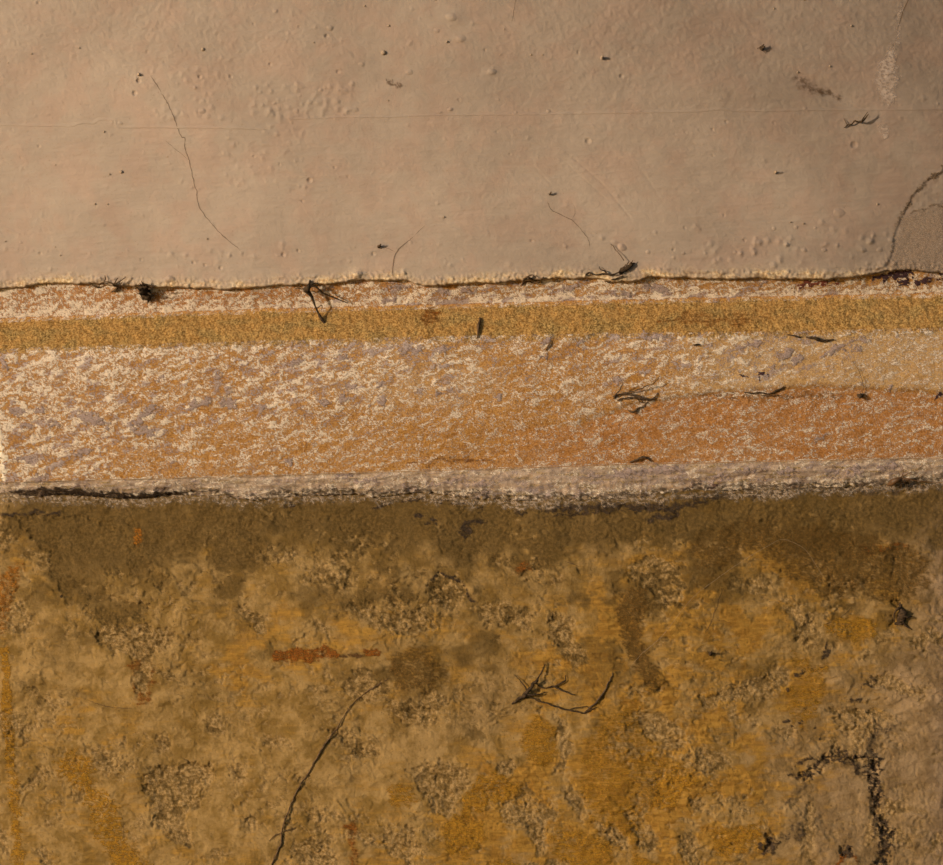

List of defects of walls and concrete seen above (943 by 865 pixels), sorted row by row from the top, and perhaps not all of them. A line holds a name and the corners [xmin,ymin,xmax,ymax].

crack [152,78,238,248]